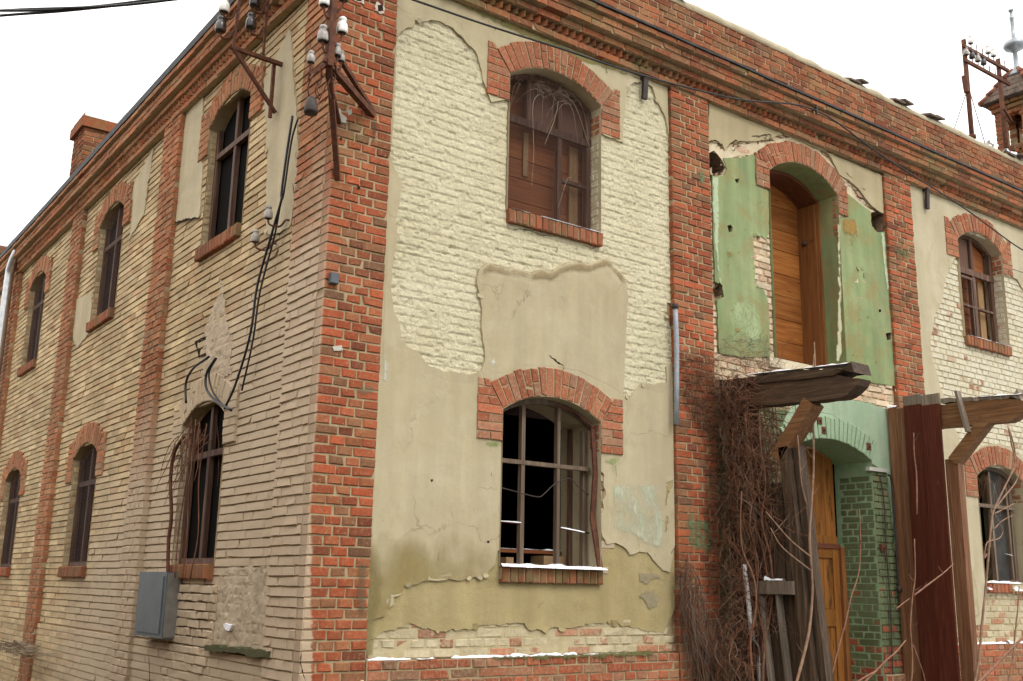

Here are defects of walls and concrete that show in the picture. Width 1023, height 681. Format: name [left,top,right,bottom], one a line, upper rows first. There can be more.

flaking render [390,18,672,399]
flaking render [709,137,884,232]
spalling [713,283,722,297]
flaking render [751,232,772,298]
flaking render [931,258,1023,398]
flaking render [714,353,780,388]
flaking render [853,383,896,414]
flaking render [978,420,1023,459]
flaking render [365,537,676,660]
flaking render [976,594,1023,644]